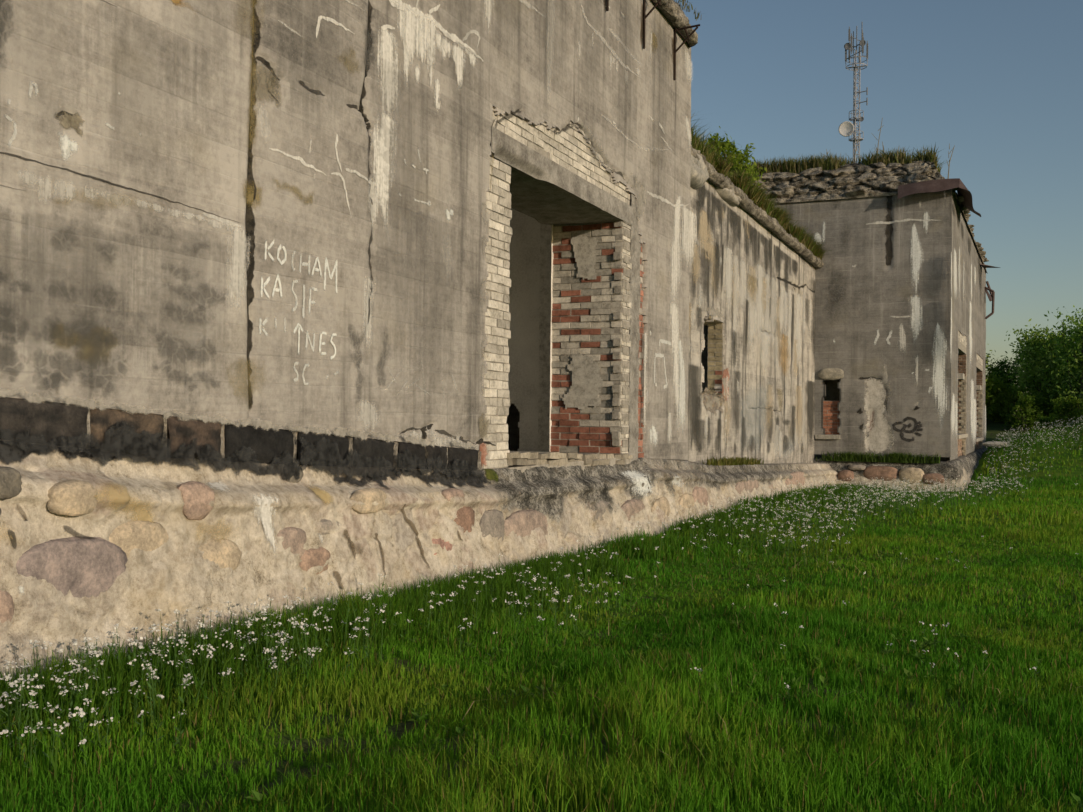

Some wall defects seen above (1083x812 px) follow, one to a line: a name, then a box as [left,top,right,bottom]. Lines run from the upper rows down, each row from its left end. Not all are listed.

crack [0,0,374,409]
water stain [369,0,493,224]
water stain [644,185,816,452]
peeling [857,366,895,453]
crack [866,189,938,266]
water stain [899,212,928,350]
water stain [933,192,981,433]
efflorescence [970,381,986,443]